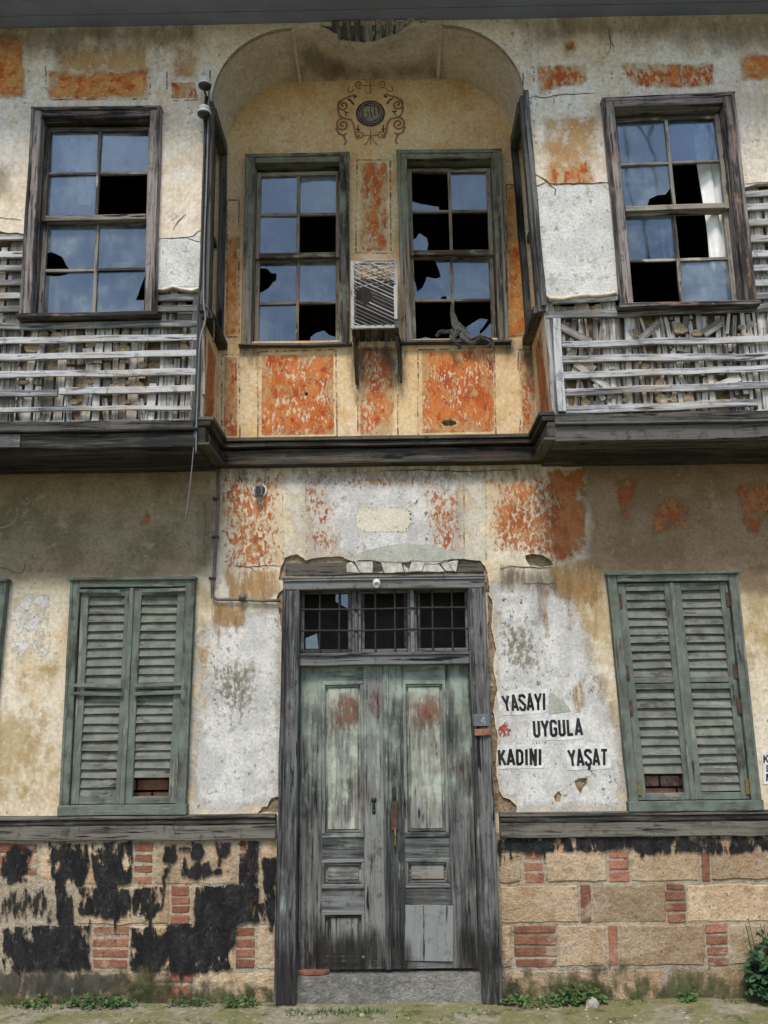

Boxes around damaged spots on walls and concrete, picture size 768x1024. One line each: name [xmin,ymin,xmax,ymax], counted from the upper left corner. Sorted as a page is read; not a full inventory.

peeling [0,35,24,97]
peeling [49,45,147,99]
peeling [538,65,586,92]
peeling [623,63,713,87]
crack [536,174,608,195]
peeling [262,355,335,435]
peeling [422,350,494,433]
peeling [9,593,51,663]
peeling [190,468,626,814]
water stain [220,665,252,714]